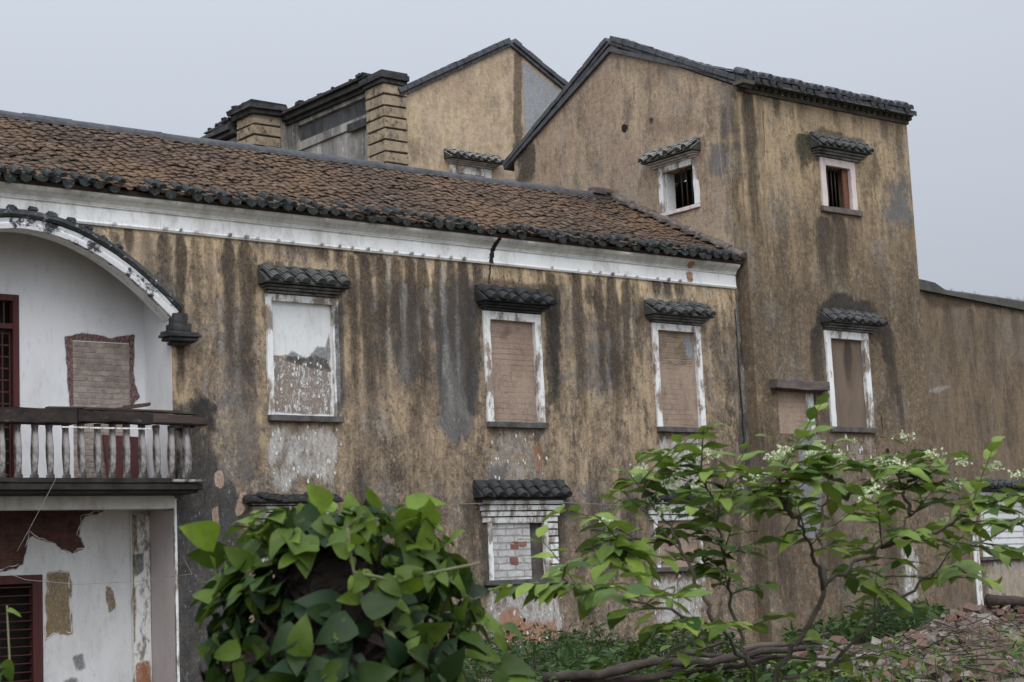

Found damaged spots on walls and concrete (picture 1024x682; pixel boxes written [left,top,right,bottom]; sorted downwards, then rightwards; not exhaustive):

leakage [513,53,522,149]
leakage [710,92,757,212]
leakage [158,234,187,313]
leakage [223,239,255,380]
leakage [314,247,482,443]
leakage [572,274,631,421]
leakage [651,281,683,296]
flaking render [267,354,342,491]
leakage [713,303,777,548]
spalling [0,510,103,572]
spalling [45,571,72,639]
peeling [488,590,563,647]